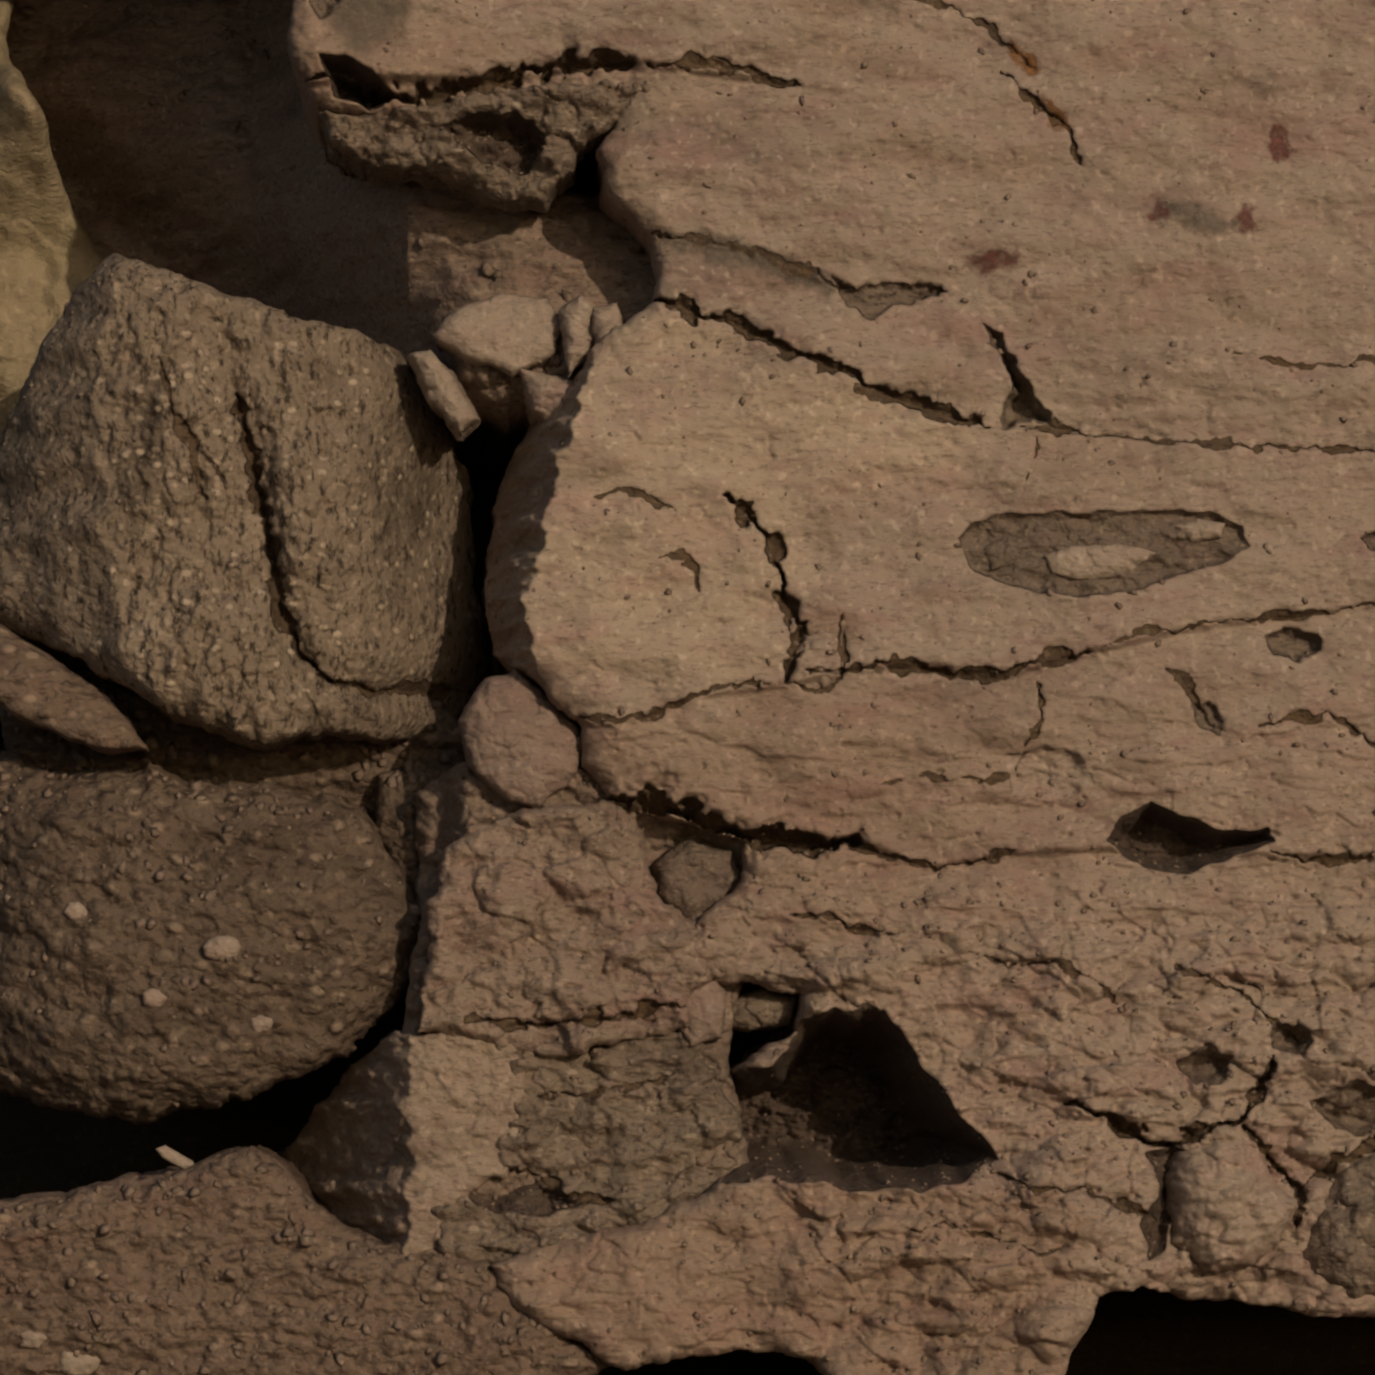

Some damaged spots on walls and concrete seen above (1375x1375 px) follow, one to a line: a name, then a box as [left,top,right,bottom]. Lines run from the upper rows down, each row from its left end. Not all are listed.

crack [307,48,801,107]
crack [653,293,1375,480]
crack [594,486,677,512]
crack [578,492,1375,785]